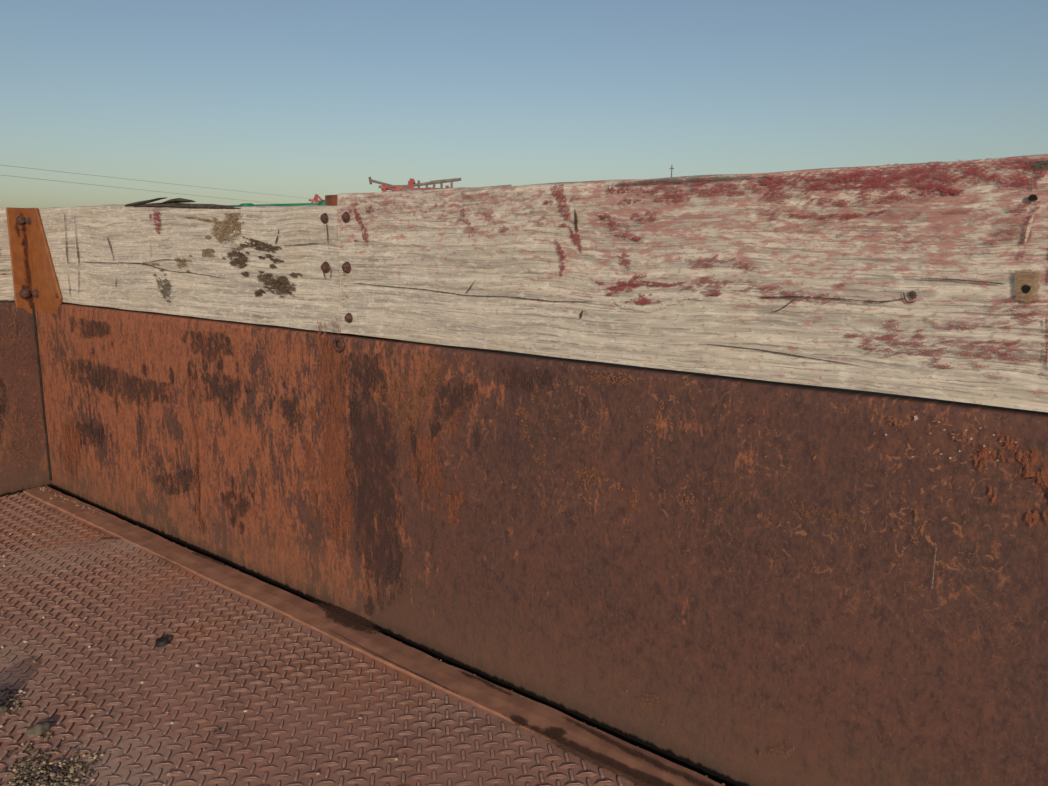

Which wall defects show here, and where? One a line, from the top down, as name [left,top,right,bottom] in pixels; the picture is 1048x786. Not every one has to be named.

peeling [604,187,660,223]
peeling [779,184,964,220]
peeling [617,251,696,303]
crack [921,277,1004,285]
crack [758,296,906,312]
rust [401,408,464,523]
rust [951,431,1048,493]